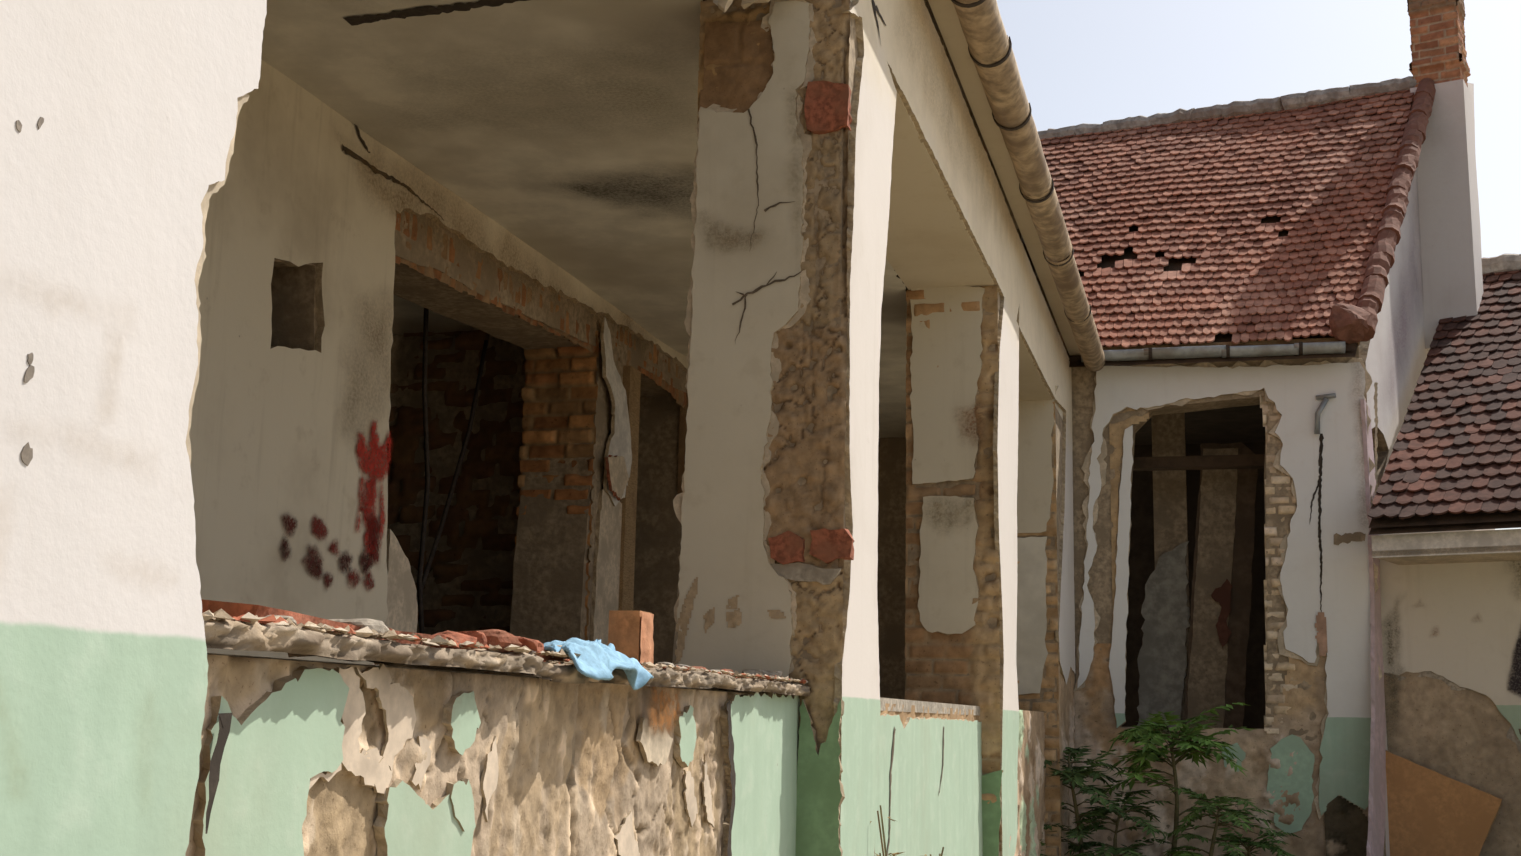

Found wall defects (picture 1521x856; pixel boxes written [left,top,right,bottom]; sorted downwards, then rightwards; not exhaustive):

crack [343,0,529,26]
crack [732,109,804,340]
flaking render [185,0,854,856]
flaking render [905,285,1328,856]
crack [1309,434,1366,612]
crack [1372,382,1380,494]
mould [1508,631,1521,695]
flaking render [1384,672,1521,856]